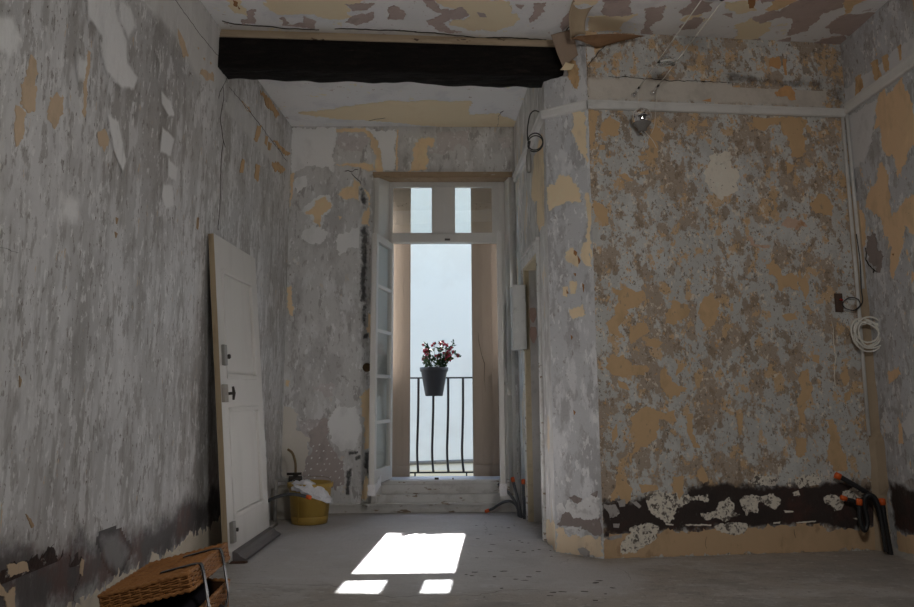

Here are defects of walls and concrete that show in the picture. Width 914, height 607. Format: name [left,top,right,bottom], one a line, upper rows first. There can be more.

peeling [226,0,375,29]
crack [222,21,546,40]
peeling [423,0,546,33]
peeling [723,0,875,44]
crack [218,78,308,224]
peeling [254,100,516,206]
peeling [531,134,609,267]
flaking render [571,56,827,175]
spalling [281,388,370,490]
flaking render [509,354,875,559]
leakage [0,465,221,607]
flaking render [0,516,222,607]